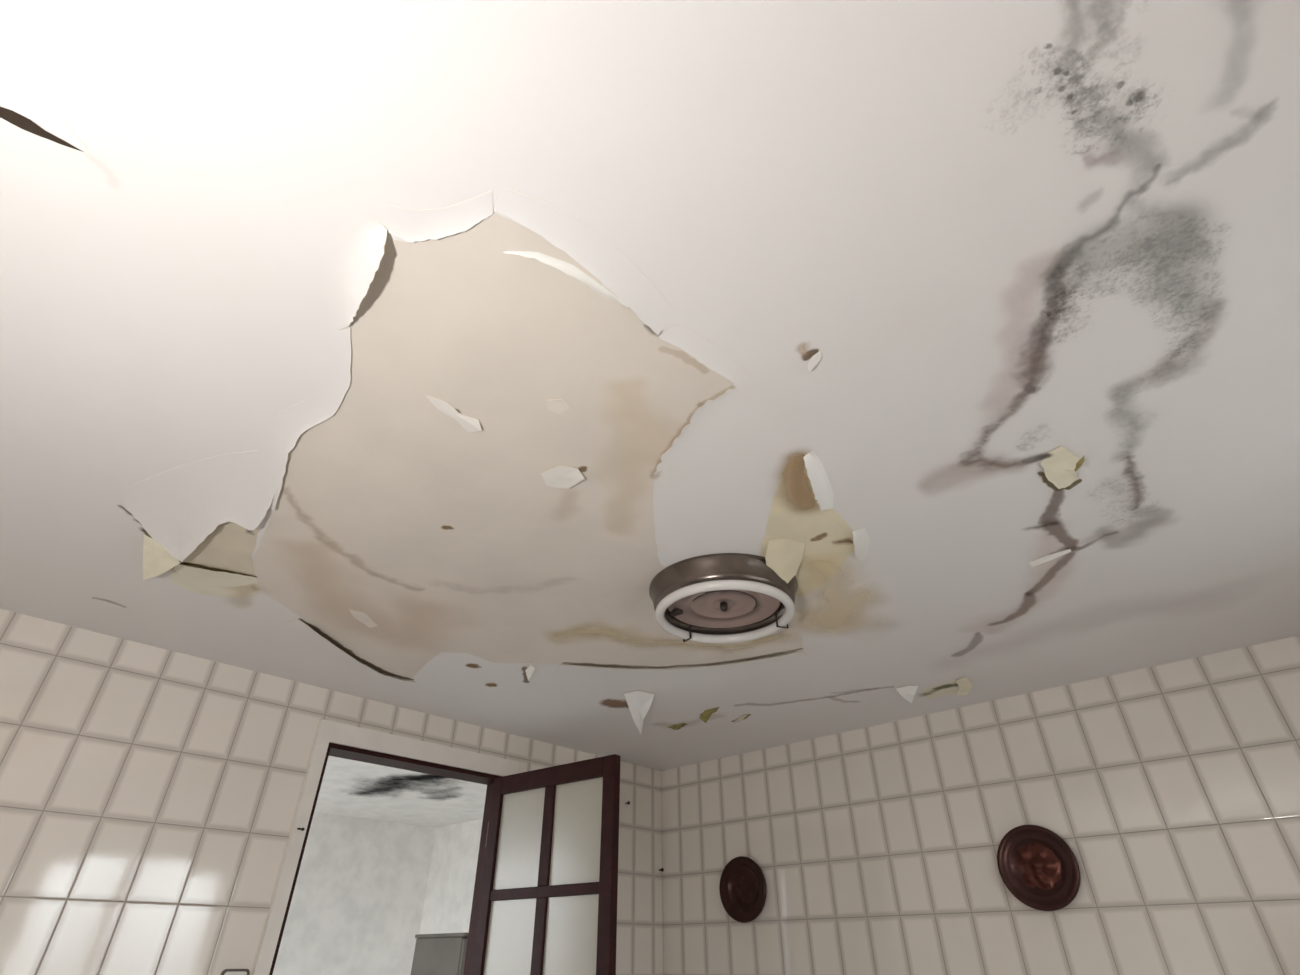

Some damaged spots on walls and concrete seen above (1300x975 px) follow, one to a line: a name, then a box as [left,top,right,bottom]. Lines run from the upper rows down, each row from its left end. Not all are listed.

crack [0,82,88,152]
peeling [803,349,822,371]
peeling [119,188,811,734]
peeling [1038,446,1085,490]
peeling [759,451,869,597]